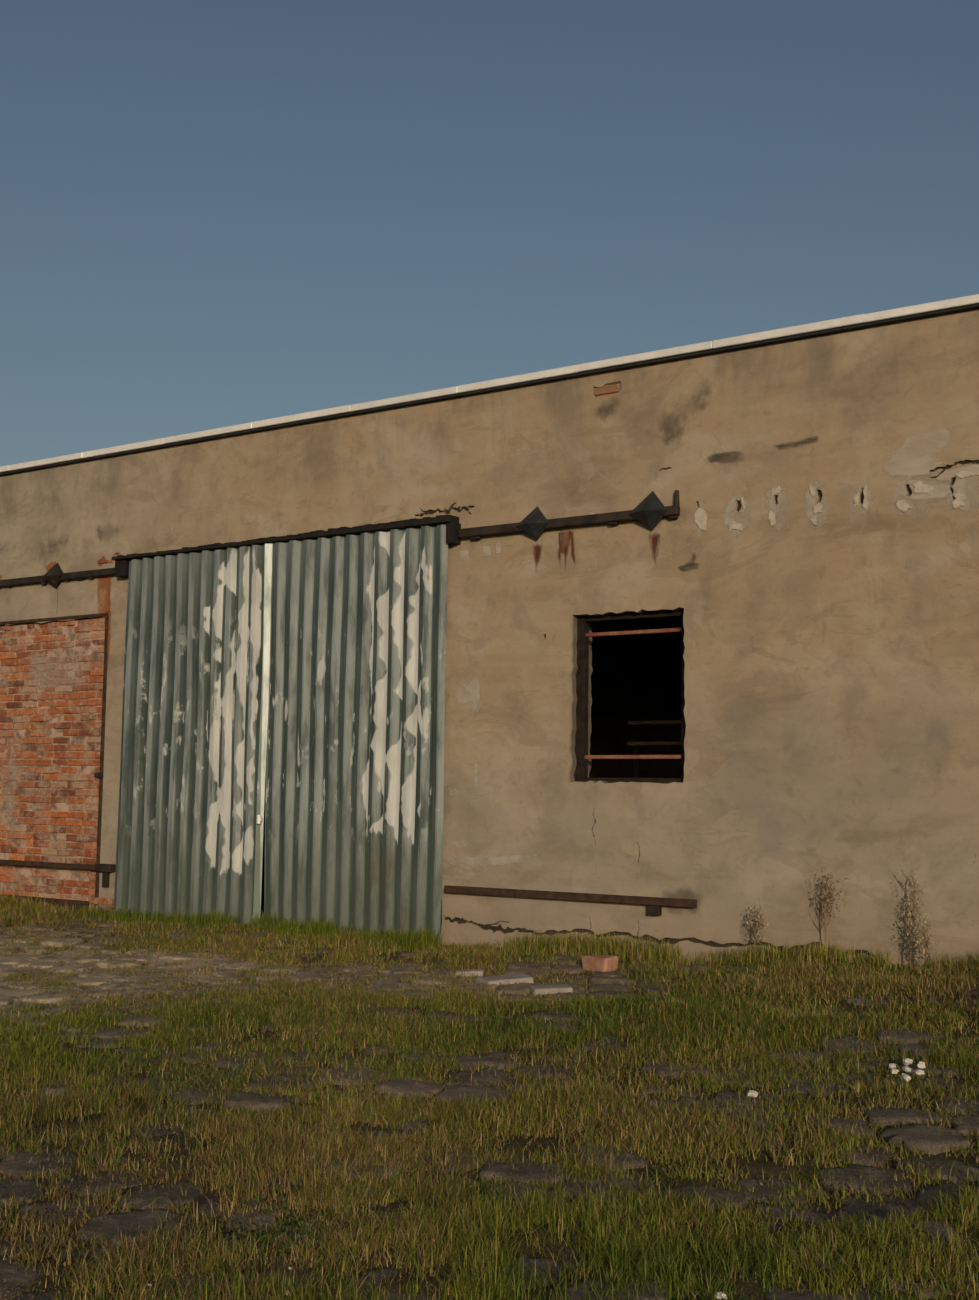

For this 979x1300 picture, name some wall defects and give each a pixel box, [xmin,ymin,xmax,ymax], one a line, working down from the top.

spalling [593,382,622,399]
peeling [883,427,979,512]
crack [931,460,979,478]
peeling [853,485,868,509]
crack [416,503,475,517]
peeling [695,507,707,530]
rust [558,532,575,562]
crack [445,917,878,958]